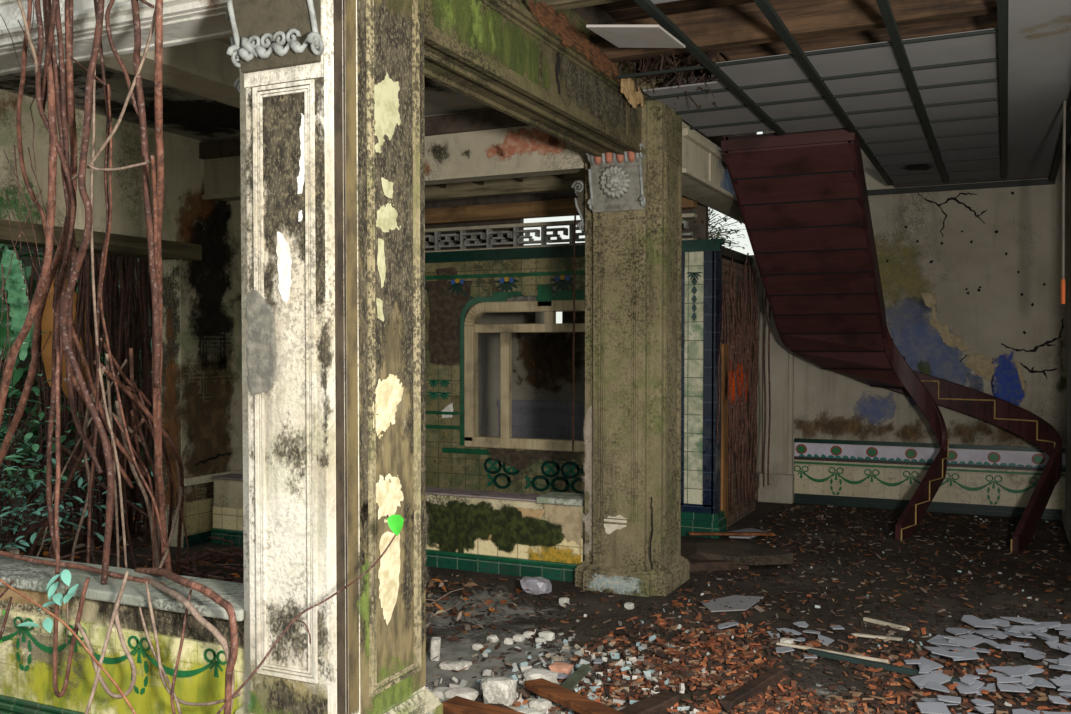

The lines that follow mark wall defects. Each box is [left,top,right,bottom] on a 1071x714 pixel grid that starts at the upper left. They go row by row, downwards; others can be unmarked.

damp [470,0,497,52]
flaking render [529,0,644,109]
peeling [487,128,566,160]
crack [918,192,987,237]
damp [161,55,333,526]
flaking render [245,290,278,396]
peeling [922,292,995,381]
crack [960,319,1064,394]
peeling [373,374,403,438]
damp [794,414,1029,444]
peeling [376,473,404,625]
damp [96,600,244,672]